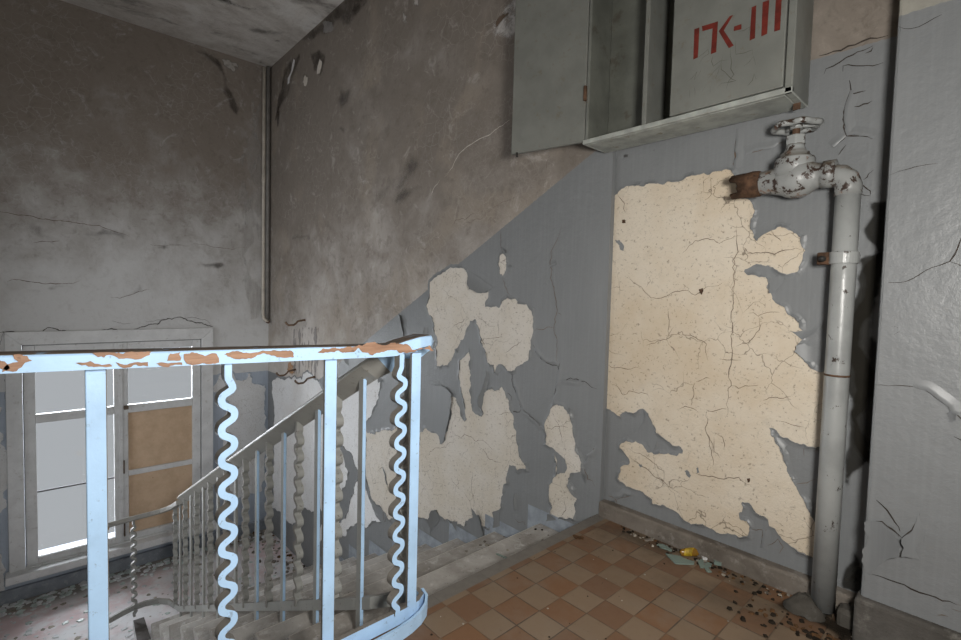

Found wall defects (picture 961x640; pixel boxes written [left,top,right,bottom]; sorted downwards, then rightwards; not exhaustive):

peeling [0,402,8,517]
peeling [0,354,32,372]
peeling [77,350,323,468]
peeling [220,414,323,544]
peeling [318,234,537,538]
peeling [541,401,585,523]
peeling [606,164,824,563]
crack [884,378,961,440]